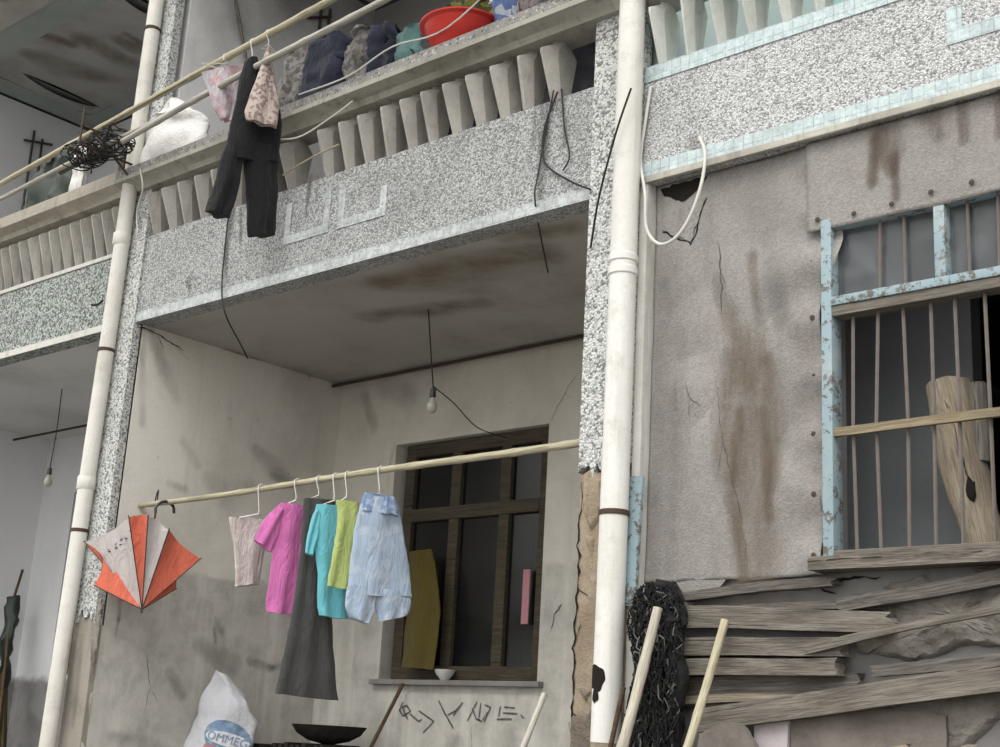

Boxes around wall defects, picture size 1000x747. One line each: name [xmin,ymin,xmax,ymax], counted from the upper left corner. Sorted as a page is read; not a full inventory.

peeling [662,197,698,241]
crack [717,242,726,312]
crack [685,382,747,558]